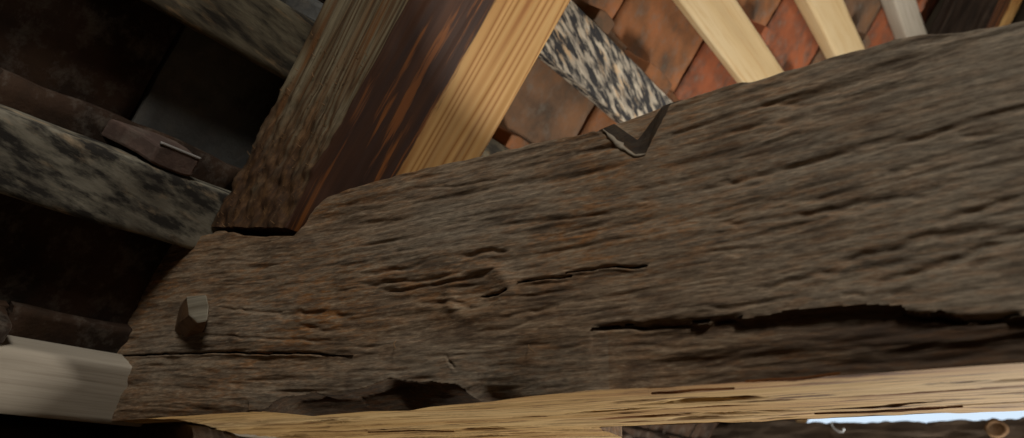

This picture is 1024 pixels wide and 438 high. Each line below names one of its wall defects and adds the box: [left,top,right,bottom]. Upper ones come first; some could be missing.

crack [481,265,648,297]
crack [591,315,743,329]
crack [122,350,353,358]